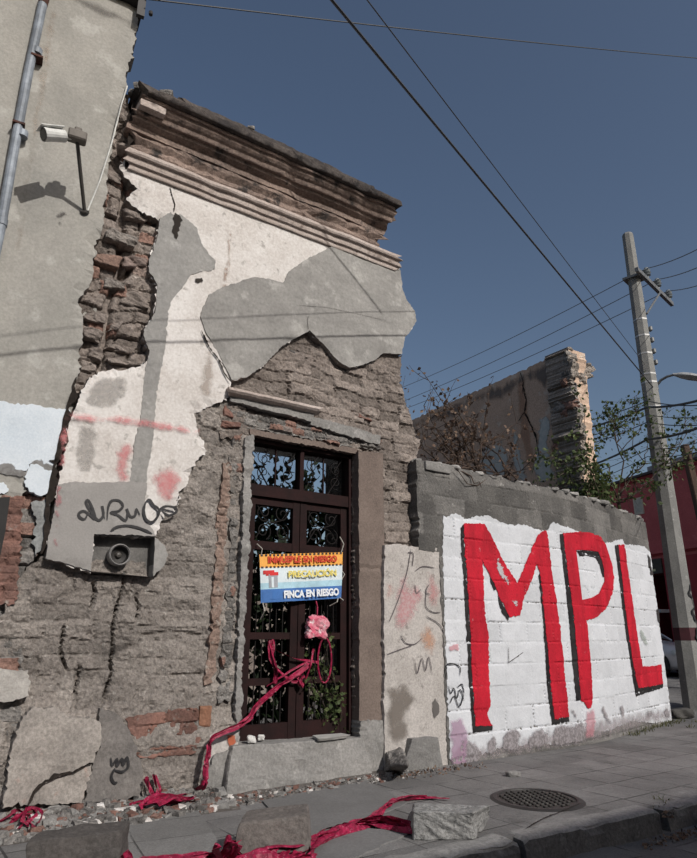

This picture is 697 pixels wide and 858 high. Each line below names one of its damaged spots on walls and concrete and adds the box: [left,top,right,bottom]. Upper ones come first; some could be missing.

spalling [75,94,156,394]
crack [518,373,539,455]
spalling [0,333,420,816]
crack [59,630,80,693]
crack [103,578,139,696]